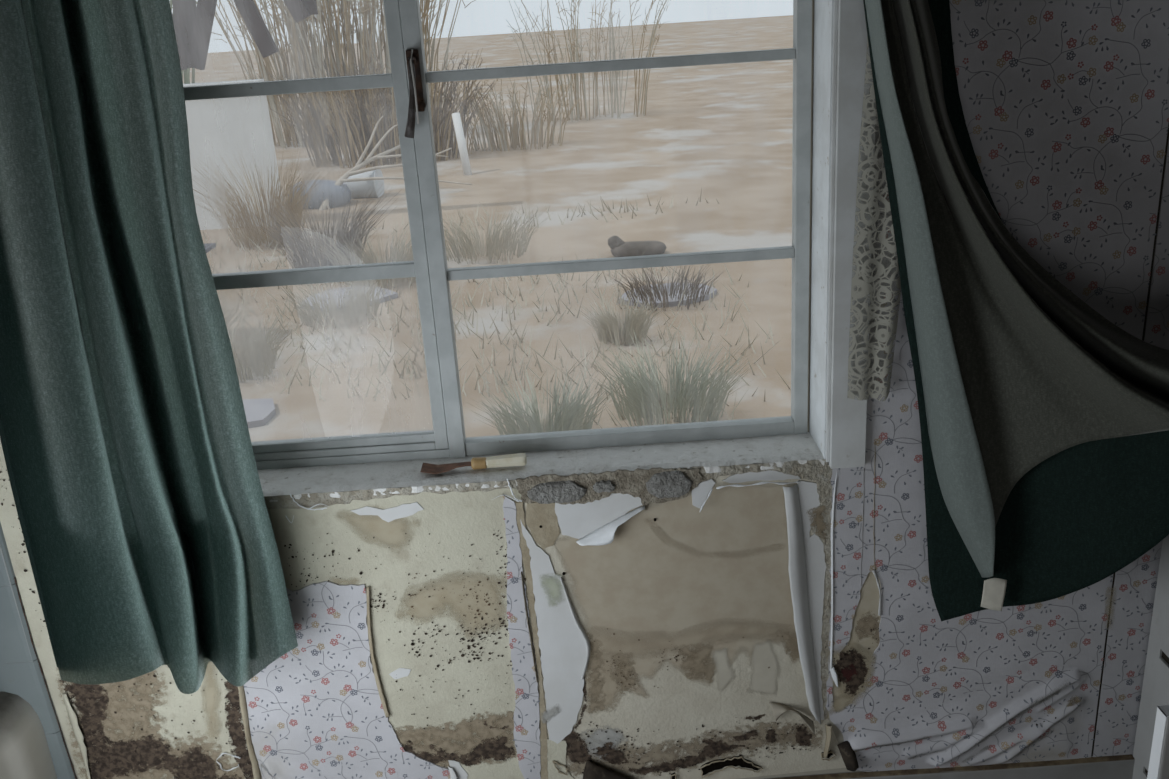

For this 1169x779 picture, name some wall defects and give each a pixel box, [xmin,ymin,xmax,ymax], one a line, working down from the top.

peeling [0,440,262,779]
leakage [55,661,254,779]
leakage [284,504,517,768]
peeling [264,459,881,779]
leakage [554,482,880,778]